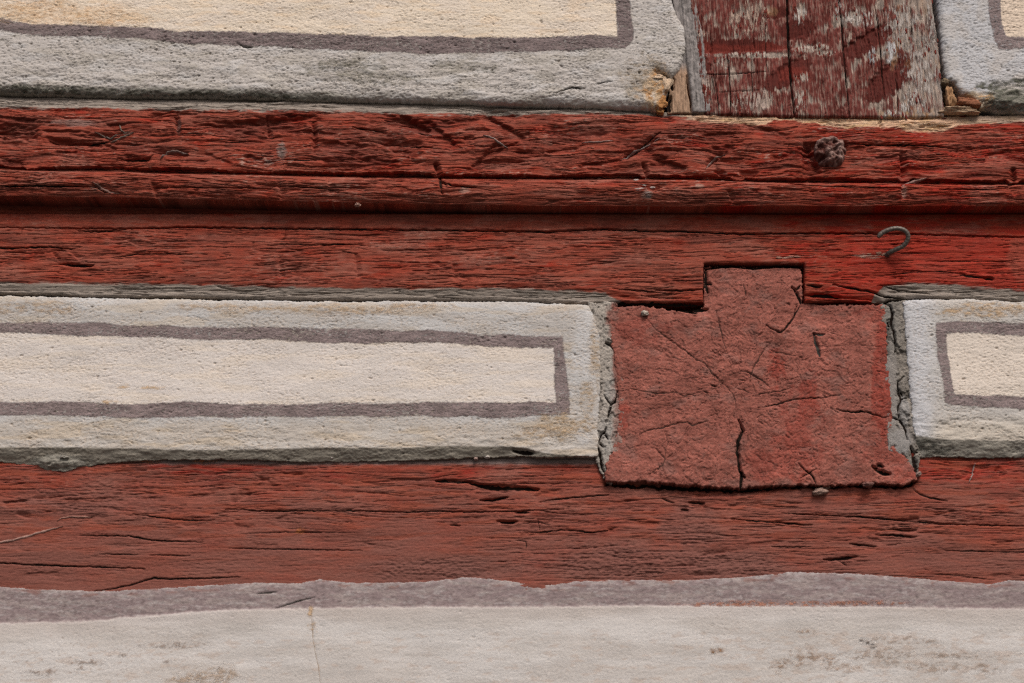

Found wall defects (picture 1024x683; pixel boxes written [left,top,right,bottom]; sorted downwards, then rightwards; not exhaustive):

peeling [727,1,769,38]
spalling [641,68,674,116]
peeling [703,72,809,122]
peeling [702,41,832,95]
peeling [815,0,948,130]
crack [705,265,799,295]
crack [597,305,918,490]